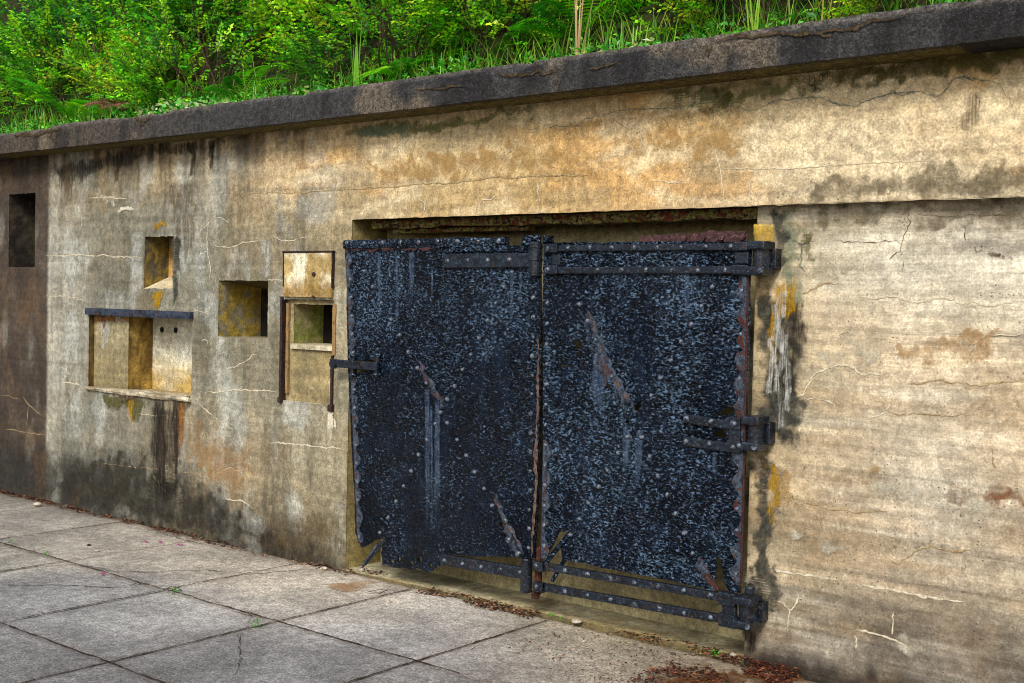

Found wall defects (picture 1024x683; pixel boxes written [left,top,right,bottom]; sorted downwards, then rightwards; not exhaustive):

leakage [57,140,225,304]
crack [529,75,1013,203]
leakage [810,174,842,227]
leakage [869,179,896,206]
leakage [909,162,955,208]
leakage [963,167,1024,225]
leakage [750,209,806,441]
crack [784,214,1024,419]
leakage [60,395,275,555]